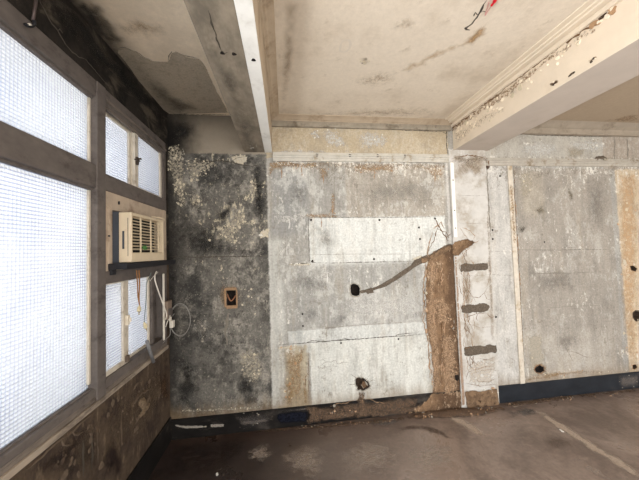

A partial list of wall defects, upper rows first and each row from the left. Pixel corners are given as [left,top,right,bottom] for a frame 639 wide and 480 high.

crack [208,11,228,54]
leakage [118,49,227,114]
peeling [452,6,617,140]
peeling [168,144,216,207]
peeling [231,154,247,165]
peeling [208,210,246,249]
crack [279,321,424,391]
hole [348,374,375,392]